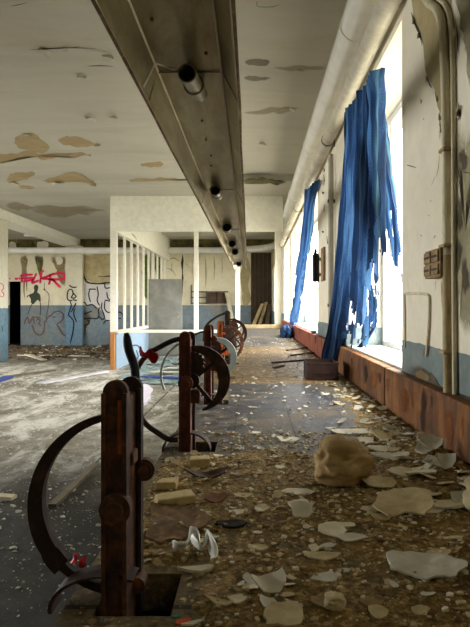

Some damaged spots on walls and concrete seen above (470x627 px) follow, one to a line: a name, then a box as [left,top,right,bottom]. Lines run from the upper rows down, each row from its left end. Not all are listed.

peeling [412,0,441,133]
peeling [433,0,470,79]
peeling [7,171,35,190]
peeling [0,133,101,163]
peeling [42,172,96,187]
water stain [456,139,470,325]